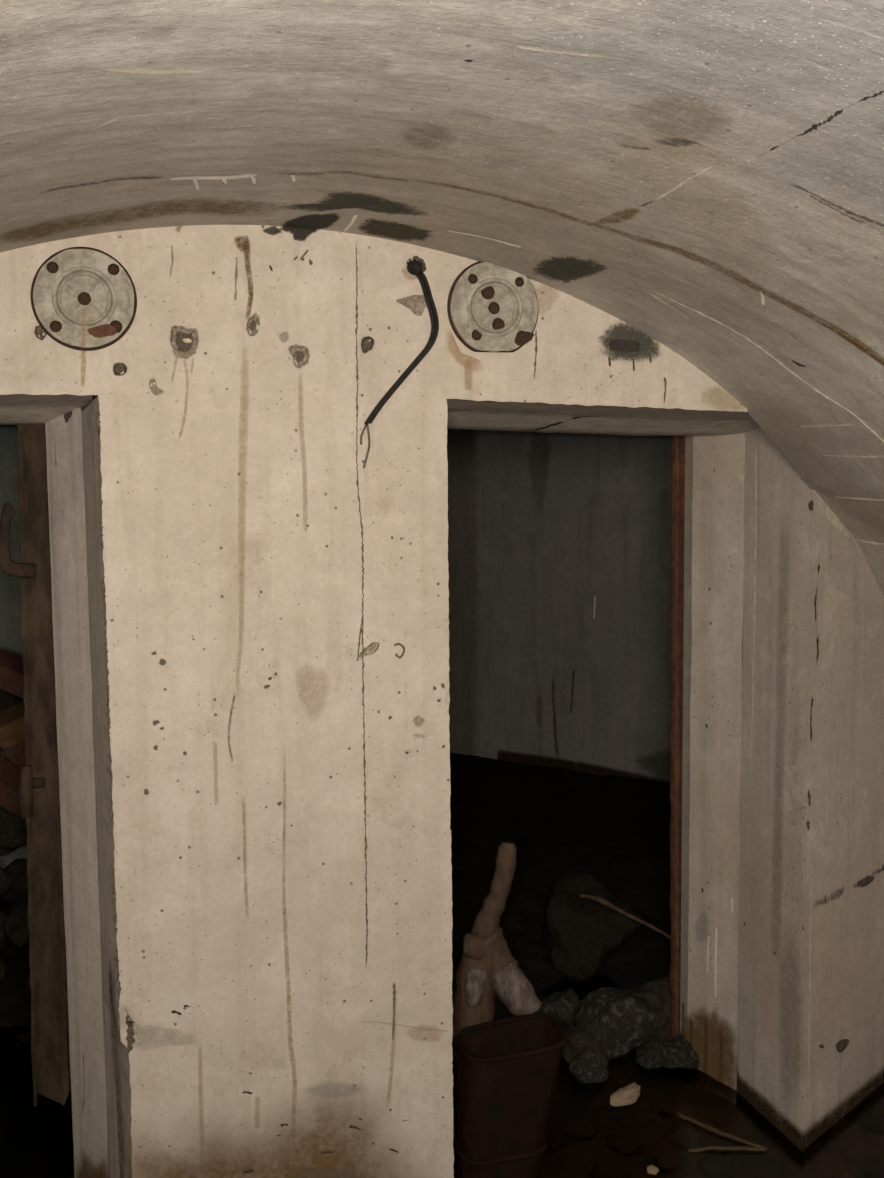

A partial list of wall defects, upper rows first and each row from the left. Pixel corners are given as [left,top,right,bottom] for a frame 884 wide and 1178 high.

crack [760,91,884,155]
leakage [263,192,432,241]
crack [600,162,731,223]
corrosion [236,237,253,314]
leakage [534,257,605,283]
corrosion [435,183,884,364]
corrosion [30,247,137,383]
corrosion [447,261,539,386]
crack [355,248,368,965]
crack [390,984,398,1039]
leakage [140,1120,381,1178]
leakage [736,1070,884,1168]